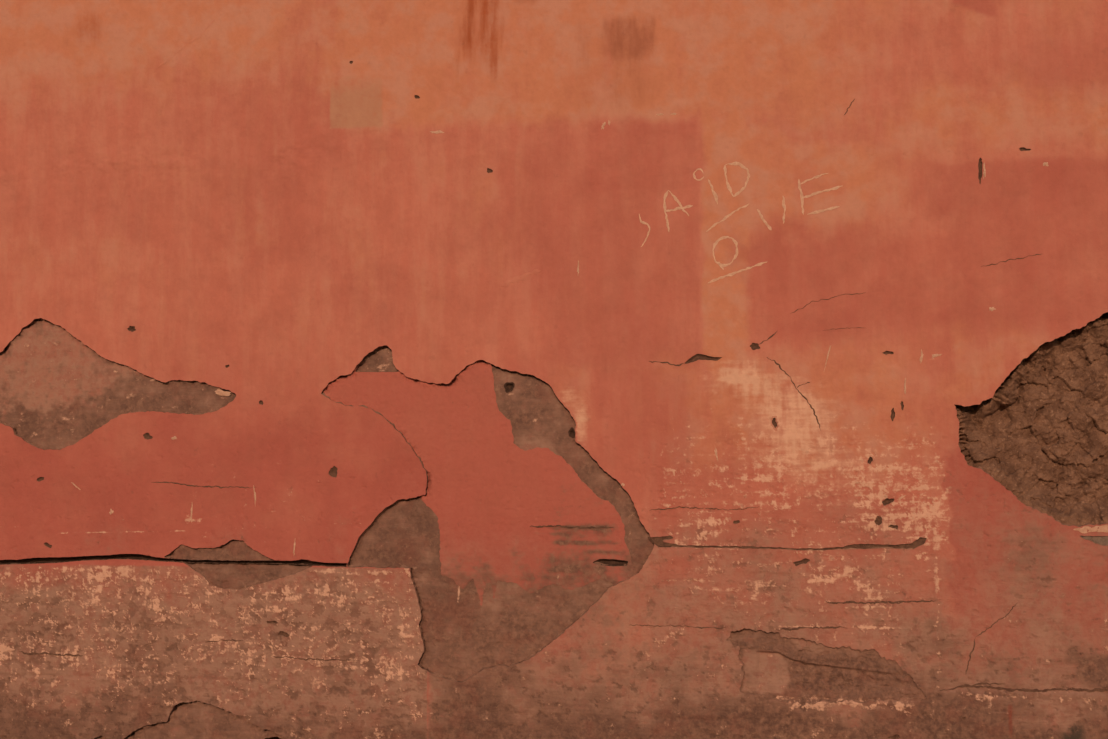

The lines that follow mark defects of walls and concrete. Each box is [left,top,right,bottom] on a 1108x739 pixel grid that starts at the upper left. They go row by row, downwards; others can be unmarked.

peeling [0,318,236,450]
spalling [955,313,1108,546]
crack [0,554,350,567]
peeling [165,539,312,590]
peeling [321,345,654,683]
crack [648,506,927,551]
spalling [726,628,926,704]
peeling [124,700,286,739]